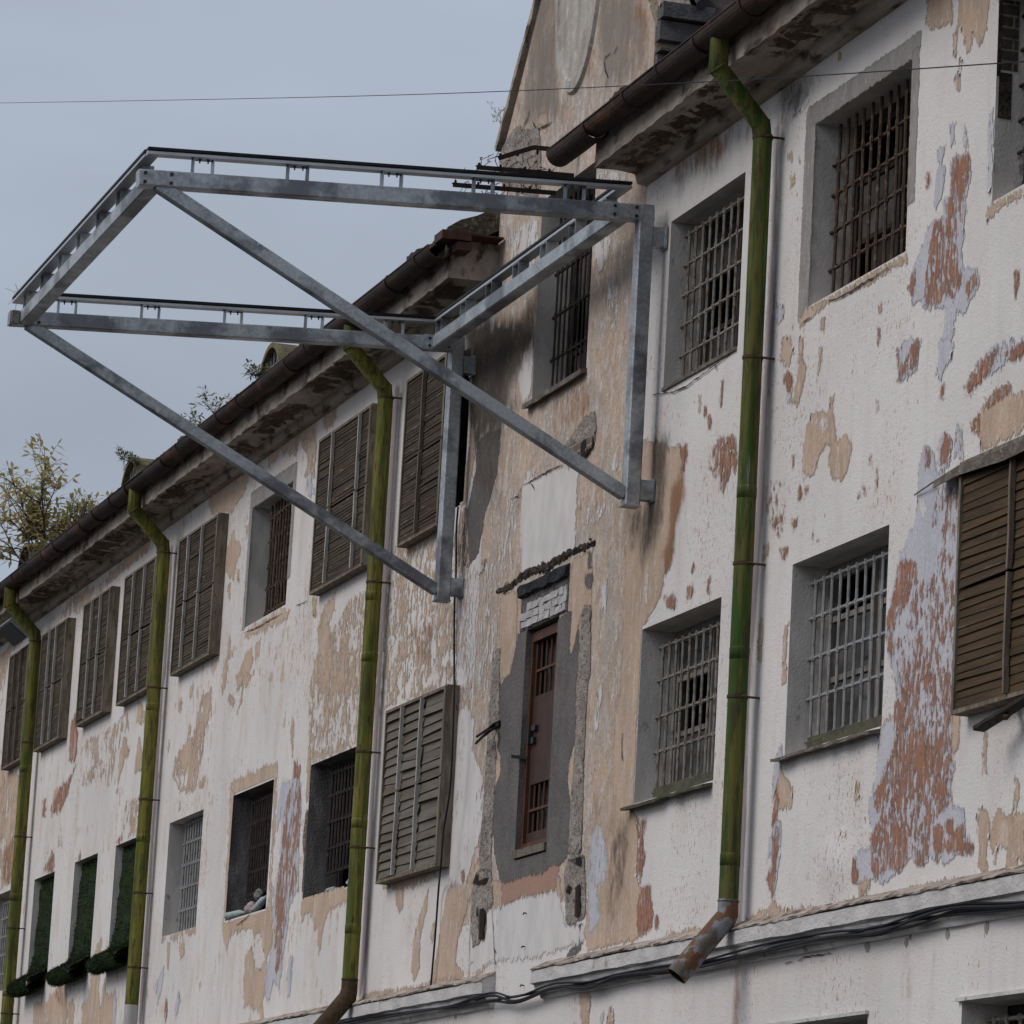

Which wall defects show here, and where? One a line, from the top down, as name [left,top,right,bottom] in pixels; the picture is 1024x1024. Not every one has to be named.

peeling [167,608,290,812]
peeling [225,525,248,600]
water stain [466,289,538,407]
peeling [507,216,539,267]
peeling [518,340,533,404]
peeling [361,406,700,999]
water stain [632,440,667,550]
peeling [698,379,739,493]
peeling [779,121,980,501]
peeling [844,335,1024,901]
peeling [222,590,365,1019]
peeling [746,744,814,921]